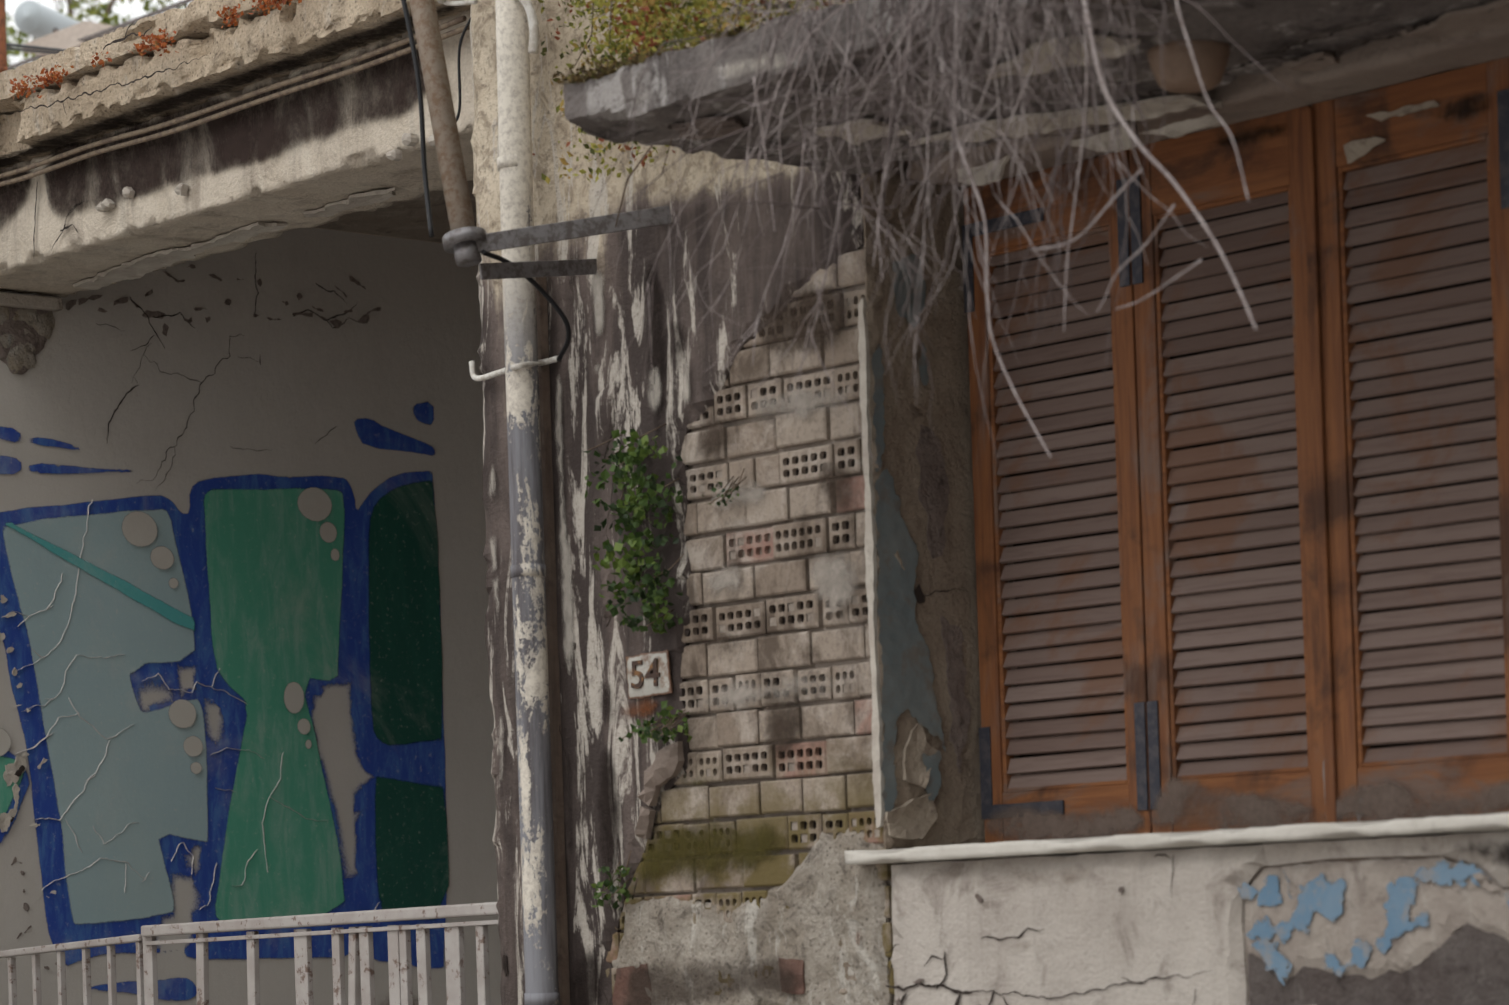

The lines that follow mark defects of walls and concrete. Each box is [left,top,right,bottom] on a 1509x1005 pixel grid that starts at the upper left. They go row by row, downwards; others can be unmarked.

flaking render [1401,0,1509,43]
damp [0,41,425,221]
peeling [1343,100,1440,164]
flaking render [0,221,288,375]
crack [96,254,261,487]
crack [293,283,360,328]
peeling [872,344,946,840]
crack [11,499,328,910]
flaking render [778,958,805,995]
crack [981,928,1044,941]
crack [885,944,1210,1005]
flaking render [1237,857,1509,1005]